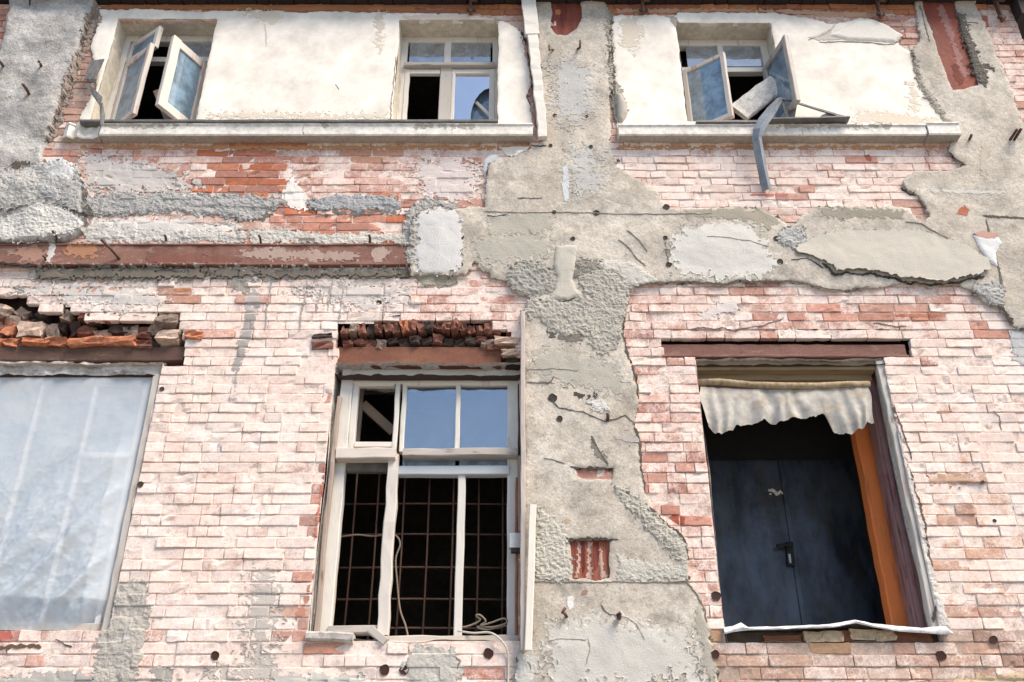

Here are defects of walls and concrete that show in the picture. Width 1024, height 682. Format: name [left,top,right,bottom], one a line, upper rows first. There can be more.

flaking render [603,7,902,123]
spalling [956,10,995,88]
spalling [11,160,31,172]
spalling [506,257,633,355]
crack [526,316,707,640]